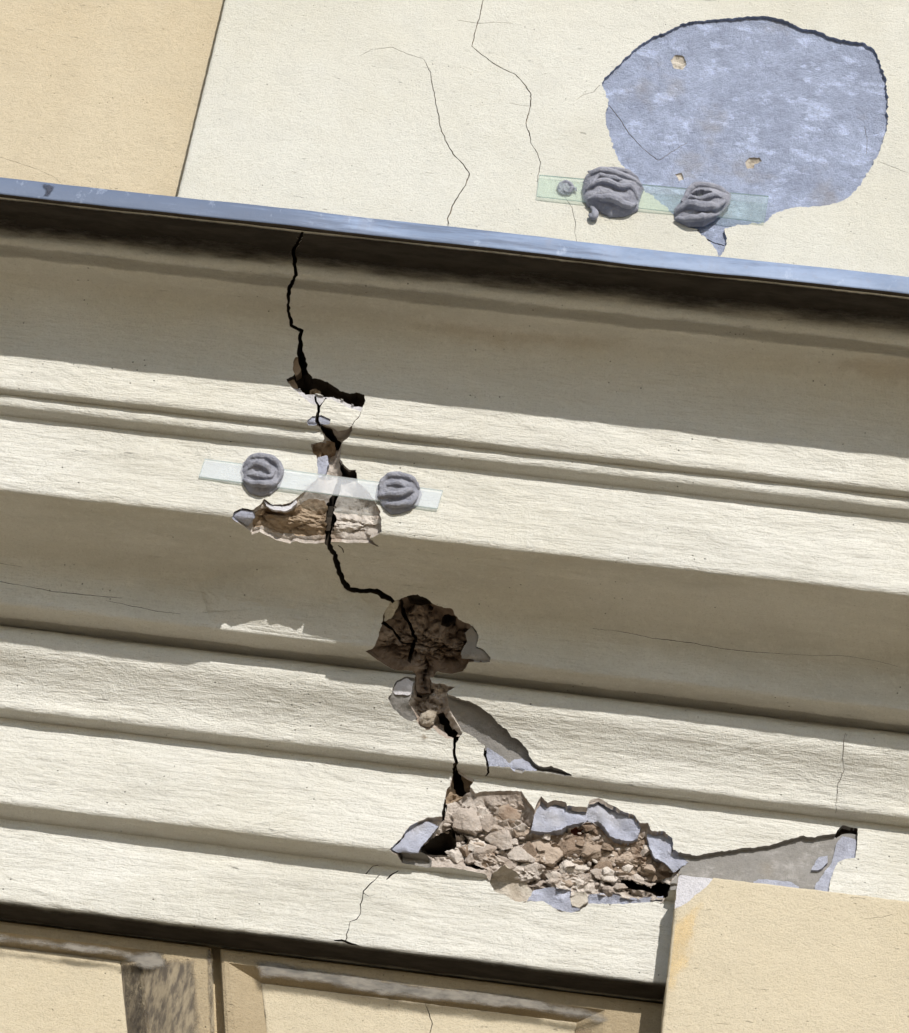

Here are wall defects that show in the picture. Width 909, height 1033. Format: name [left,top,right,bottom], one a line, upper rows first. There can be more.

crack [360,47,470,224]
crack [459,1,541,182]
peeling [602,16,889,257]
crack [286,230,308,376]
spalling [232,357,382,547]
crack [324,506,395,603]
spalling [366,596,572,777]
crack [334,865,398,947]
crack [442,737,474,821]
spalling [390,769,858,913]